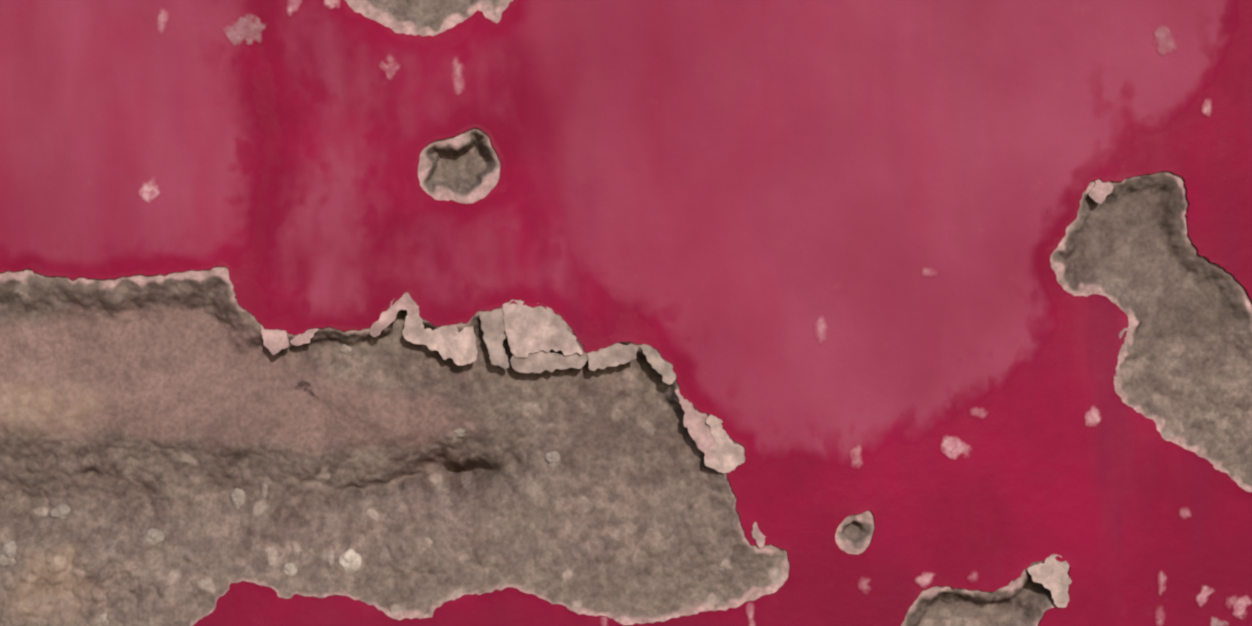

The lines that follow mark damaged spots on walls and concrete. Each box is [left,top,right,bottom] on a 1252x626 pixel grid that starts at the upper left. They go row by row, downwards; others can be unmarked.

peeling [222,13,269,46]
peeling [286,0,303,18]
spalling [322,0,513,36]
spalling [418,128,501,204]
spalling [1050,171,1252,492]
spalling [0,266,790,626]
spalling [835,510,875,555]
spalling [901,554,1072,626]